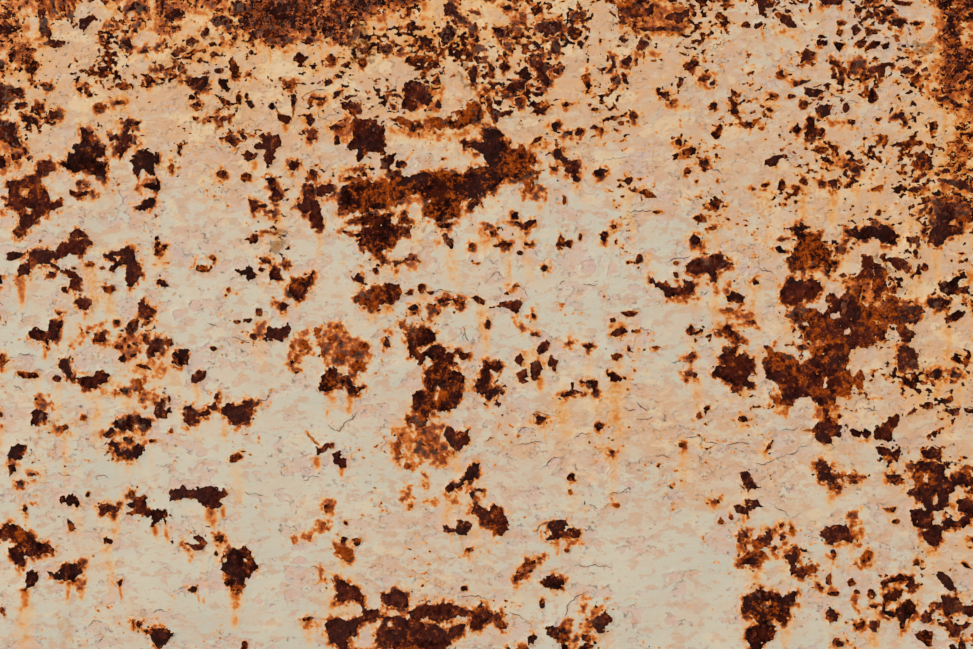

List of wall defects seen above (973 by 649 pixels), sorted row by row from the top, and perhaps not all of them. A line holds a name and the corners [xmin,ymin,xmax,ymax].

rust [192,157,237,214]
rust [183,249,231,280]
rust [462,236,481,275]
rust [220,284,242,301]
rust [547,283,586,328]
rust [652,400,737,512]
rust [312,476,391,531]
rust [594,472,622,508]
rust [66,517,82,536]
rust [328,532,363,563]
rust [947,557,973,574]
rust [176,583,206,607]